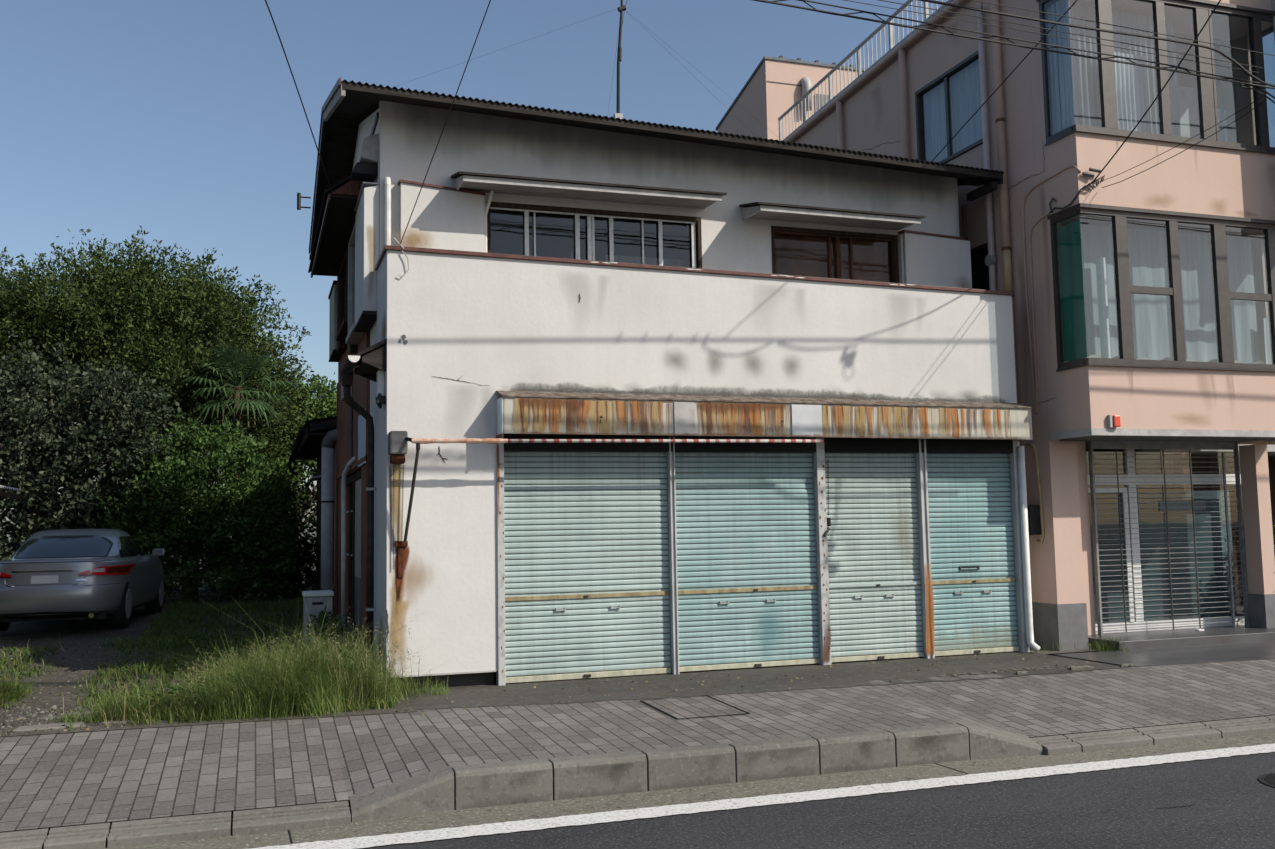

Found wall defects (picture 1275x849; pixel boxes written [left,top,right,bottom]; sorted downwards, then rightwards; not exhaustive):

corrosion [513,398,1018,439]
corrosion [389,464,402,531]
corrosion [391,547,412,652]
corrosion [925,572,934,654]